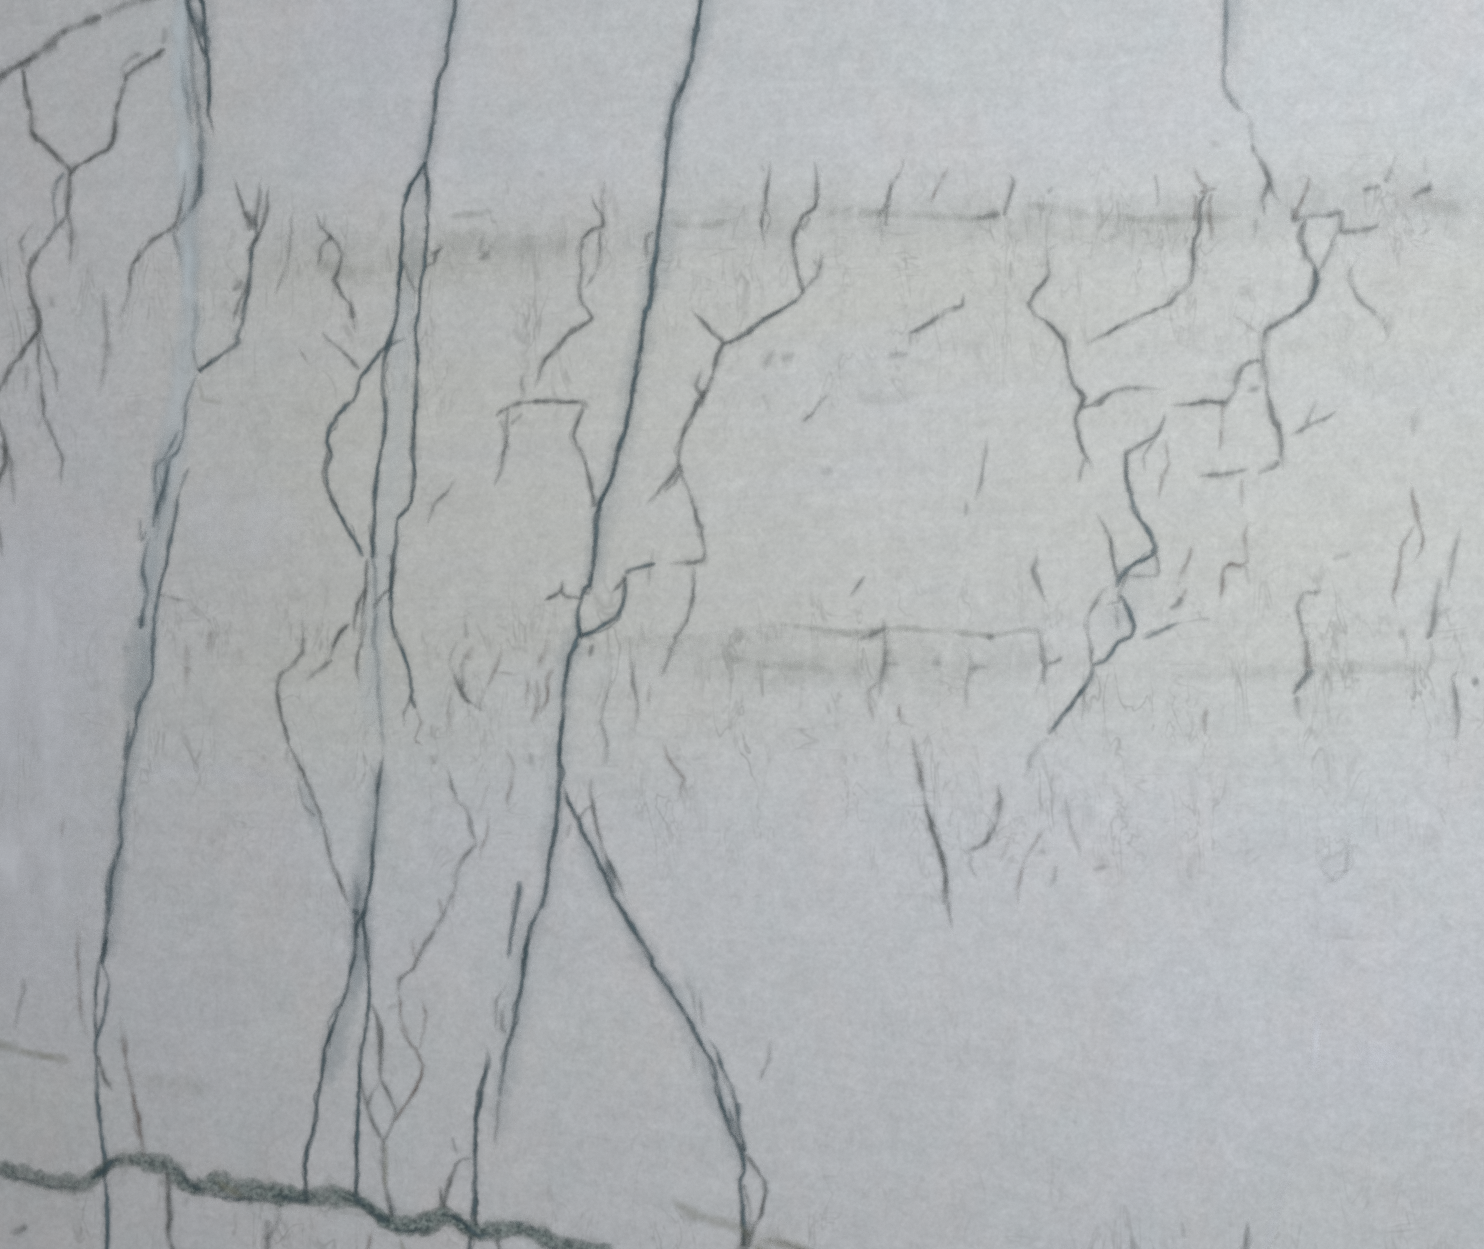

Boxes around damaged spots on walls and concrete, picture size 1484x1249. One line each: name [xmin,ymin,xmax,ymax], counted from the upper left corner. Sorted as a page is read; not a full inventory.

crack [23,75,116,199]
crack [157,0,211,179]
crack [0,439,8,477]
crack [10,301,40,371]
crack [134,232,196,301]
crack [128,336,238,747]
crack [248,239,256,286]
crack [326,0,456,701]
crack [515,0,750,1246]
crack [1077,388,1107,409]
crack [1054,438,1156,728]
crack [1,844,607,1249]